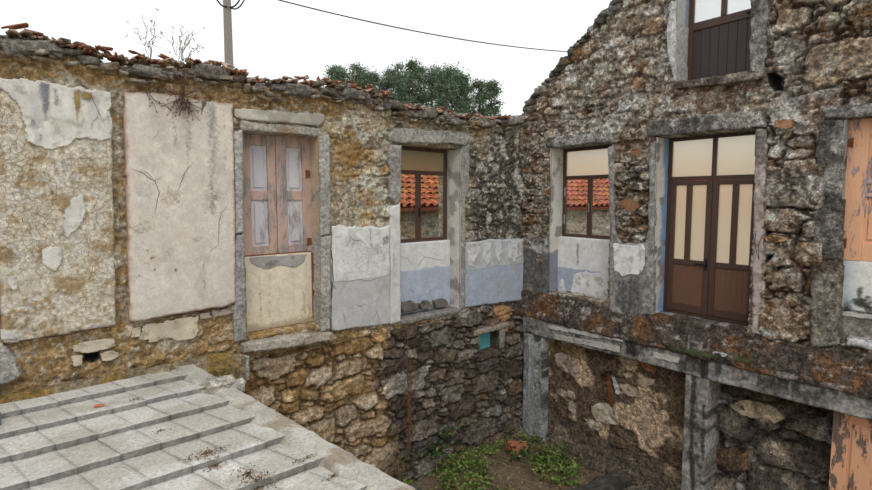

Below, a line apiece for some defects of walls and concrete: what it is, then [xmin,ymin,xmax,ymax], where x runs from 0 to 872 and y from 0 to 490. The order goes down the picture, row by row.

flaking render [0,77,113,149]
crack [129,163,193,211]
crack [0,103,111,342]
flaking render [62,194,86,238]
flaking render [42,246,62,271]
peeling [250,254,307,269]
leakage [844,288,872,313]
crack [132,304,234,323]
flaking render [0,329,20,340]
peeling [584,418,602,431]